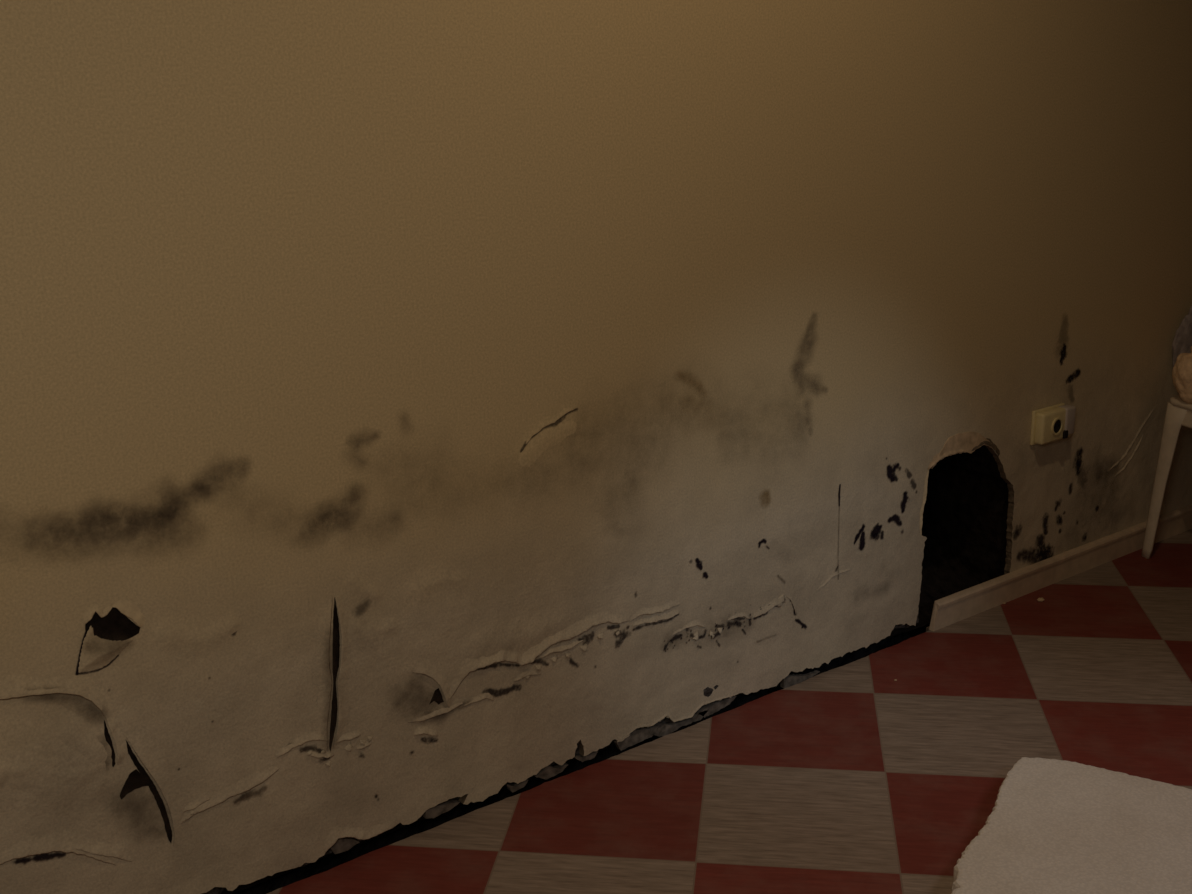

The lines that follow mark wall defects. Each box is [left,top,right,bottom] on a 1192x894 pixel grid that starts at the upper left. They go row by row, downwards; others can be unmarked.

water stain [1060,344,1081,383]
crack [519,403,578,452]
water stain [1017,448,1083,563]
peeling [76,599,145,675]
crack [310,594,354,752]
flaking render [172,432,1000,894]
peeling [0,831,134,865]